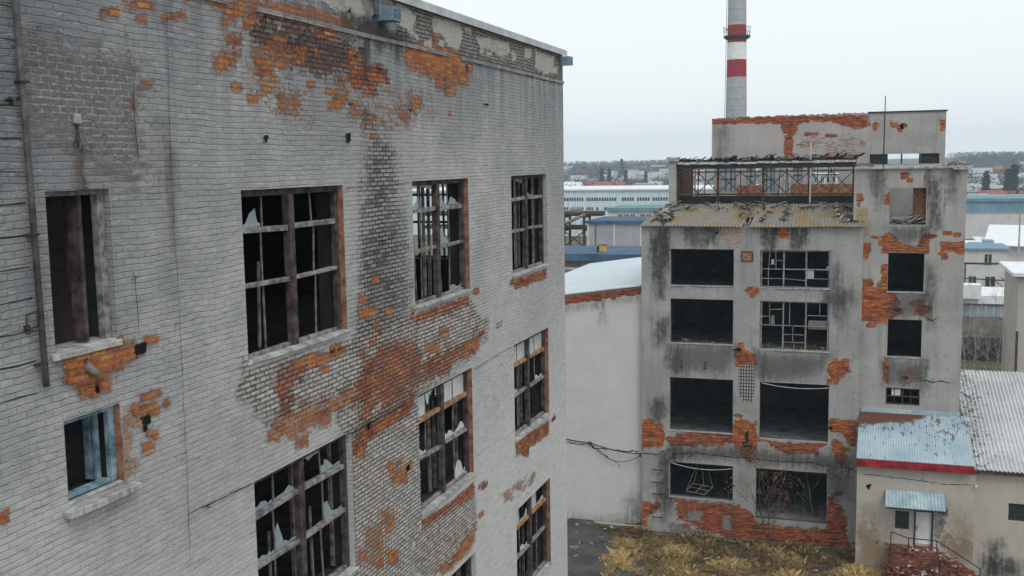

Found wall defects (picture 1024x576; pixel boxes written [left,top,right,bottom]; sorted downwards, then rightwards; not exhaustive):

peeling [205,0,562,143]
flaking render [712,114,908,158]
water stain [352,130,413,370]
flaking render [565,289,642,305]
flaking render [861,231,965,328]
peeling [62,335,160,399]
flaking render [826,358,851,385]
peeling [122,388,171,485]
peeling [237,287,503,576]
flaking render [642,413,858,466]
flaking render [669,491,856,549]